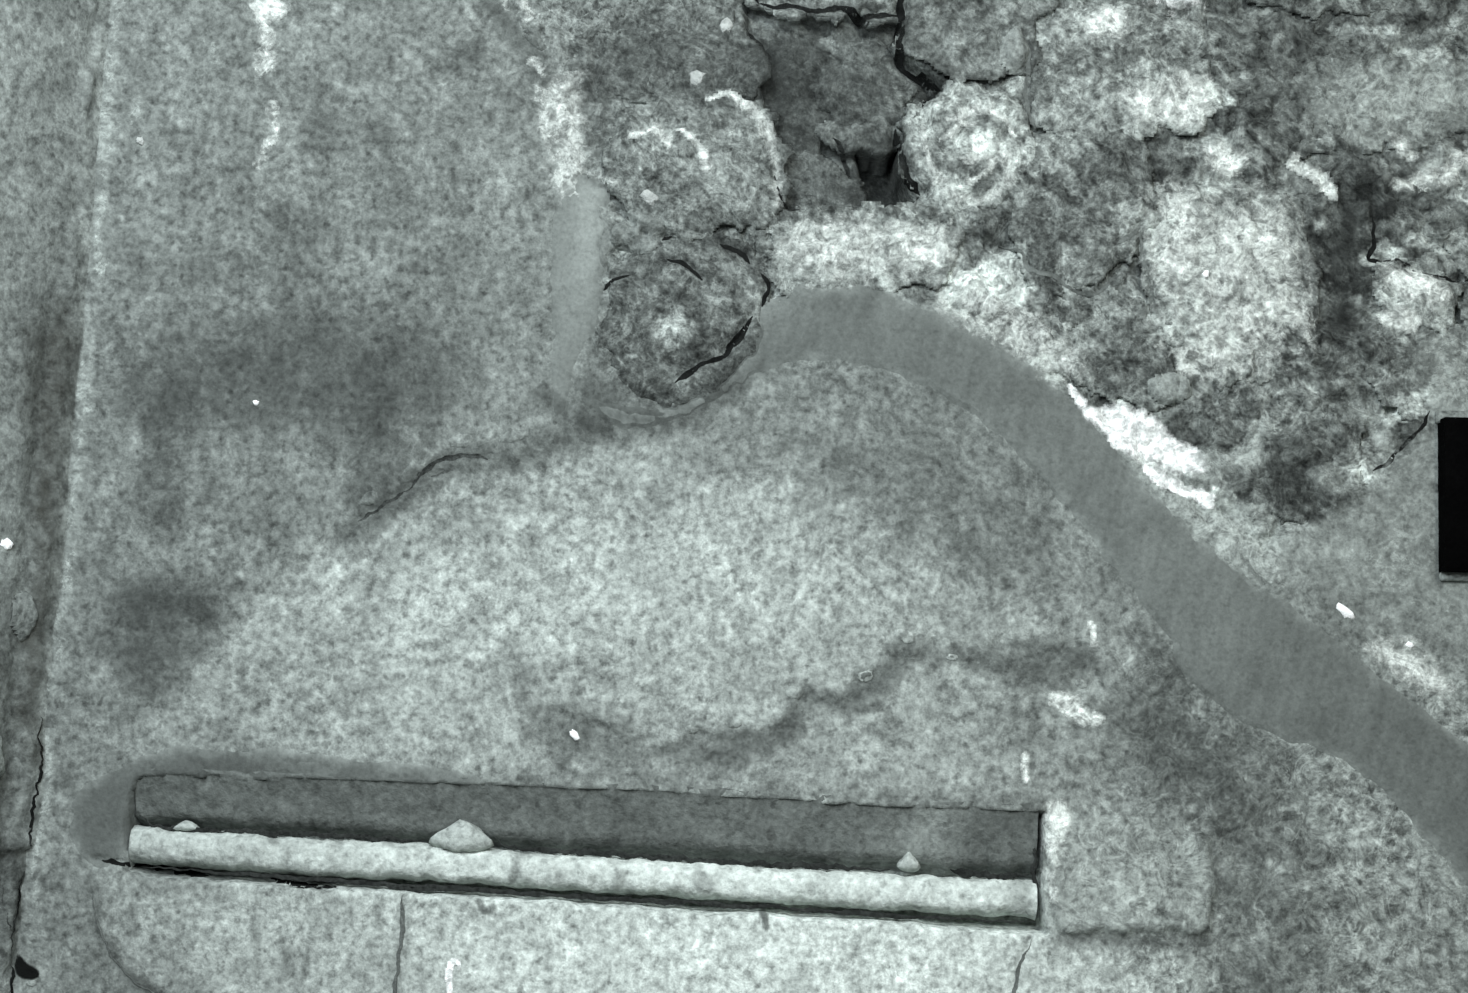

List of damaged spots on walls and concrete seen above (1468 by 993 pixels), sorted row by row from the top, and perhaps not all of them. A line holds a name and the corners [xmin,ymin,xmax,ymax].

peeling [689,70,707,86]
peeling [719,17,733,33]
crack [748,0,941,196]
peeling [639,189,659,206]
crack [1366,214,1468,283]
crack [675,244,771,383]
water stain [942,277,1285,590]
water stain [1048,693,1104,725]
water stain [1365,638,1452,692]
crack [0,717,44,993]
crack [91,815,1038,993]
water stain [1039,802,1256,931]